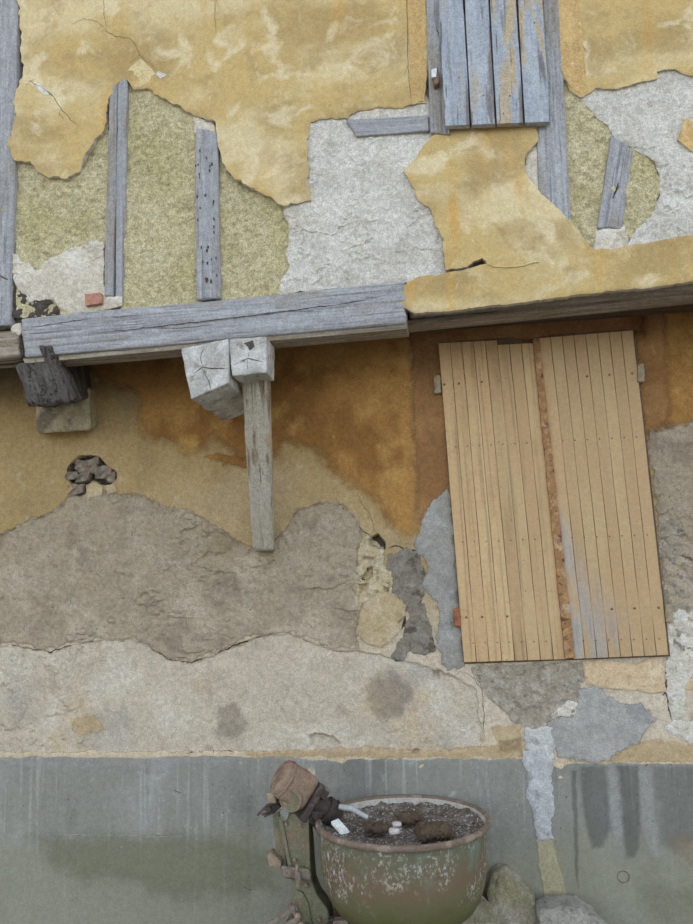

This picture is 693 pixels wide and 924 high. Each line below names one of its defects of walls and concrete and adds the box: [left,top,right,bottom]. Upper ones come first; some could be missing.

crack [29,80,75,123]
spalling [12,238,123,318]
spalling [193,117,216,132]
spalling [278,71,693,295]
spalling [0,456,585,753]
spalling [647,423,693,745]